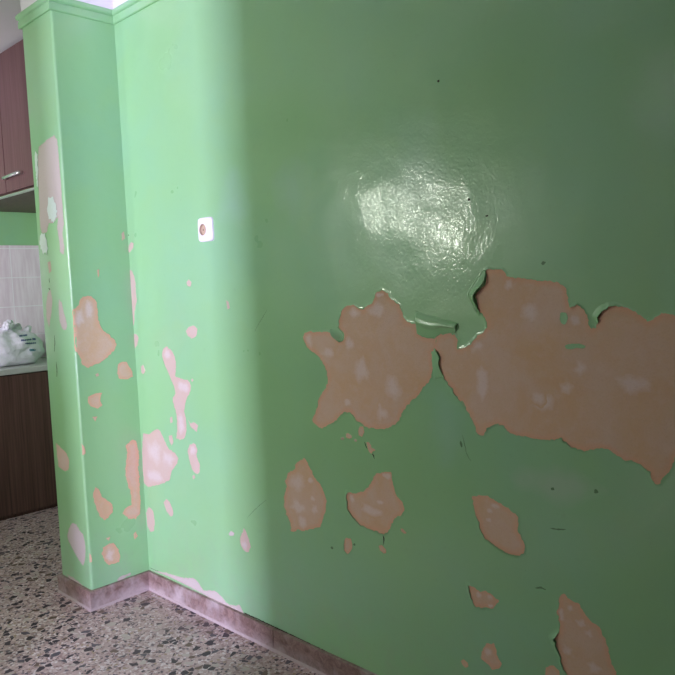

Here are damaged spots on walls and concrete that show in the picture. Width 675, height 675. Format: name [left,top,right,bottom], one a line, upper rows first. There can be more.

peeling [35,133,65,274]
peeling [45,288,118,377]
peeling [302,266,675,488]
peeling [91,345,201,533]
peeling [67,521,122,567]
peeling [282,455,329,534]
peeling [343,469,407,556]
peeling [470,492,527,559]
peeling [153,570,245,614]
peeling [465,582,502,613]
peeling [478,641,504,672]
peeling [544,592,620,675]